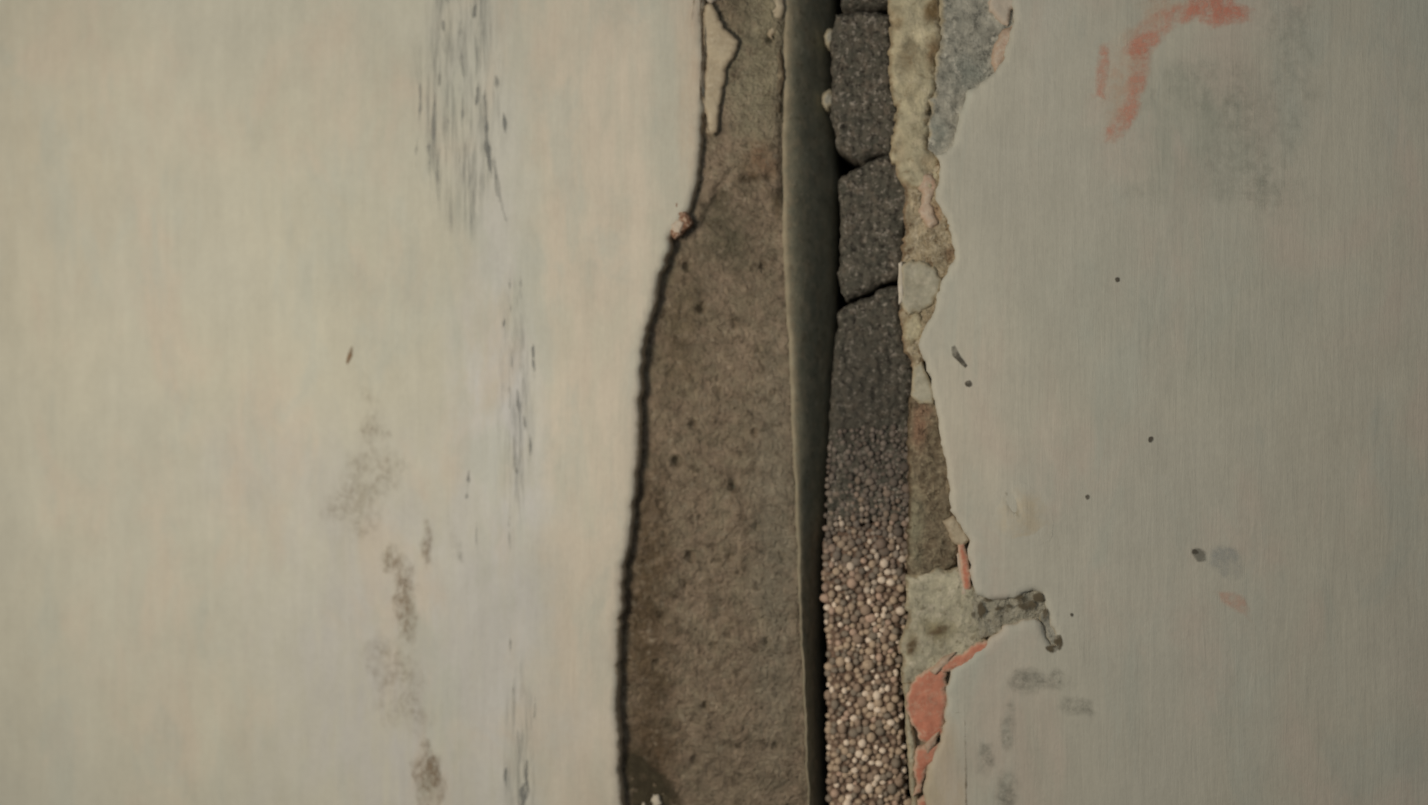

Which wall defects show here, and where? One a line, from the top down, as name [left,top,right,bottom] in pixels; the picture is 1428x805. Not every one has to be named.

damp [484,114,506,179]
flaking render [620,0,808,805]
flaking render [887,0,1014,805]